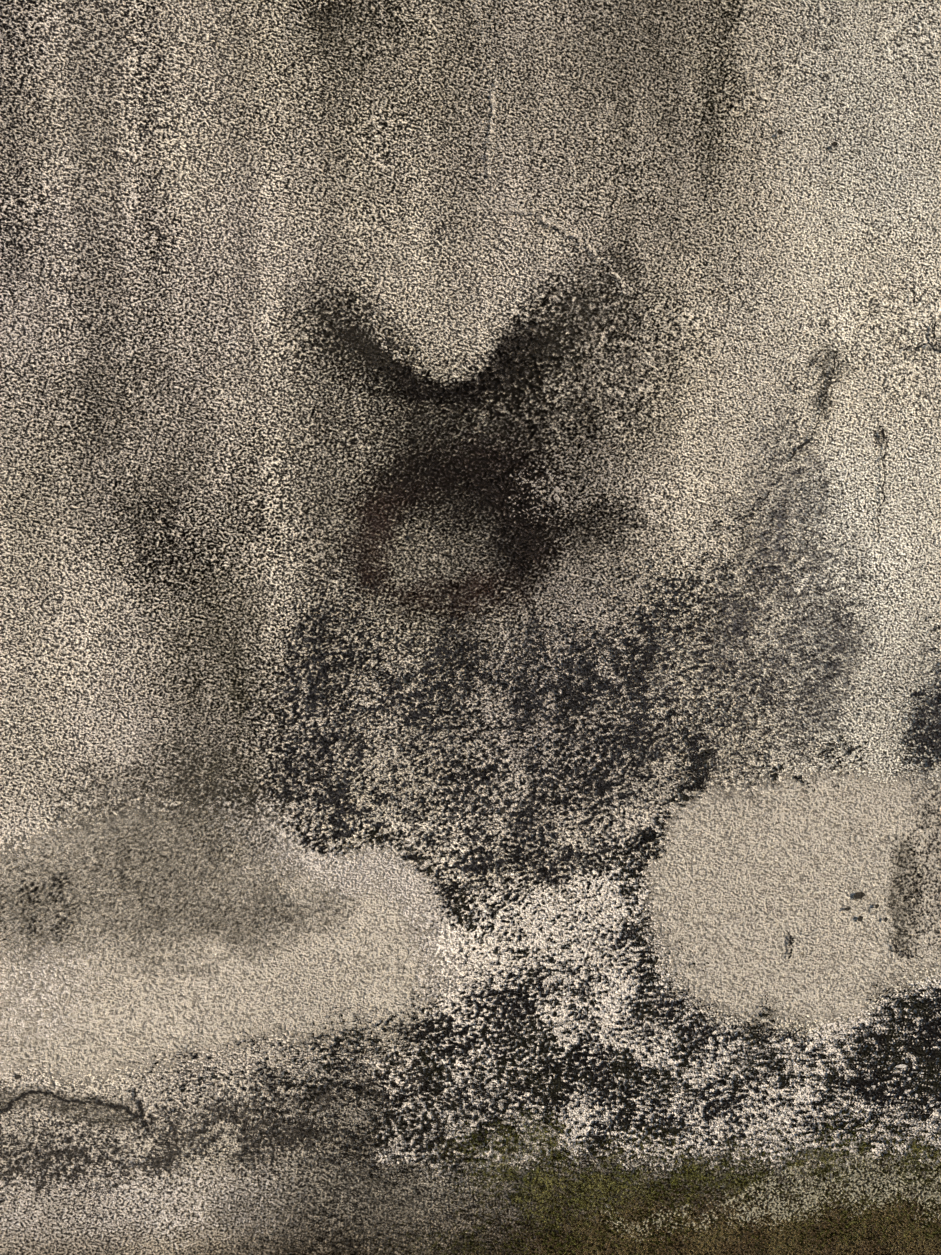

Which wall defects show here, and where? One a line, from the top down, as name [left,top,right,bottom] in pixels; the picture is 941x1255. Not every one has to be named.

water stain [808,340,854,418]
crack [0,1086,152,1135]